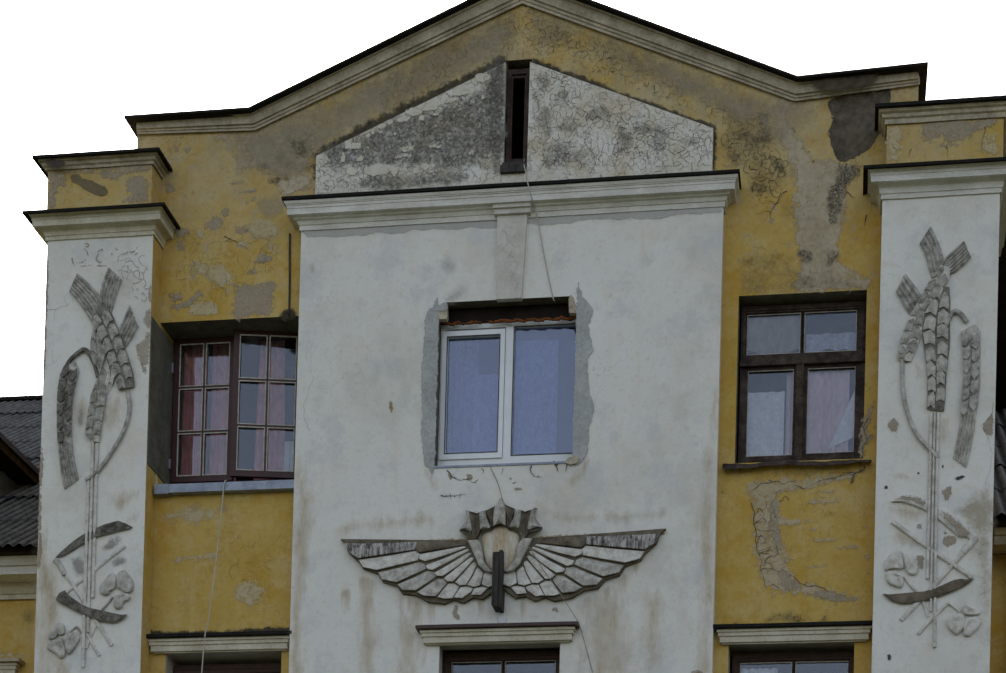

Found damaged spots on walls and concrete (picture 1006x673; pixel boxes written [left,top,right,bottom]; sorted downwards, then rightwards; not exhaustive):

flaking render [48,165,152,209]
flaking render [279,175,311,196]
water stain [326,60,506,190]
crack [318,5,788,218]
flaking render [772,88,891,293]
flaking render [232,253,276,320]
flaking render [746,401,875,602]